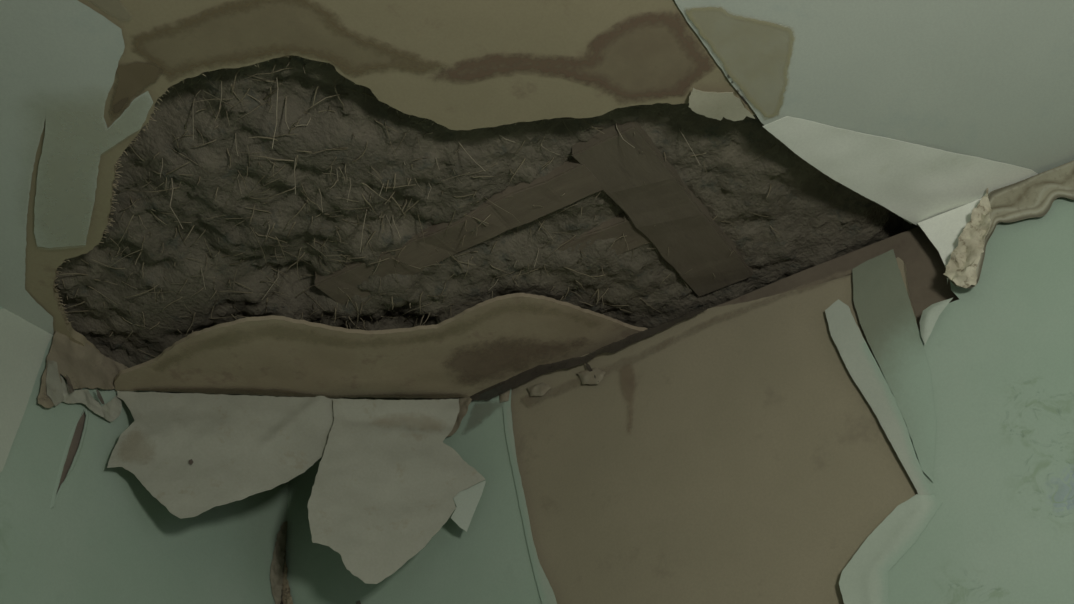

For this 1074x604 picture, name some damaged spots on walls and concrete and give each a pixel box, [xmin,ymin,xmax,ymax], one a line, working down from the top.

peeling [25,0,756,354]
damp [134,0,795,118]
peeling [763,116,1038,283]
peeling [511,274,918,604]